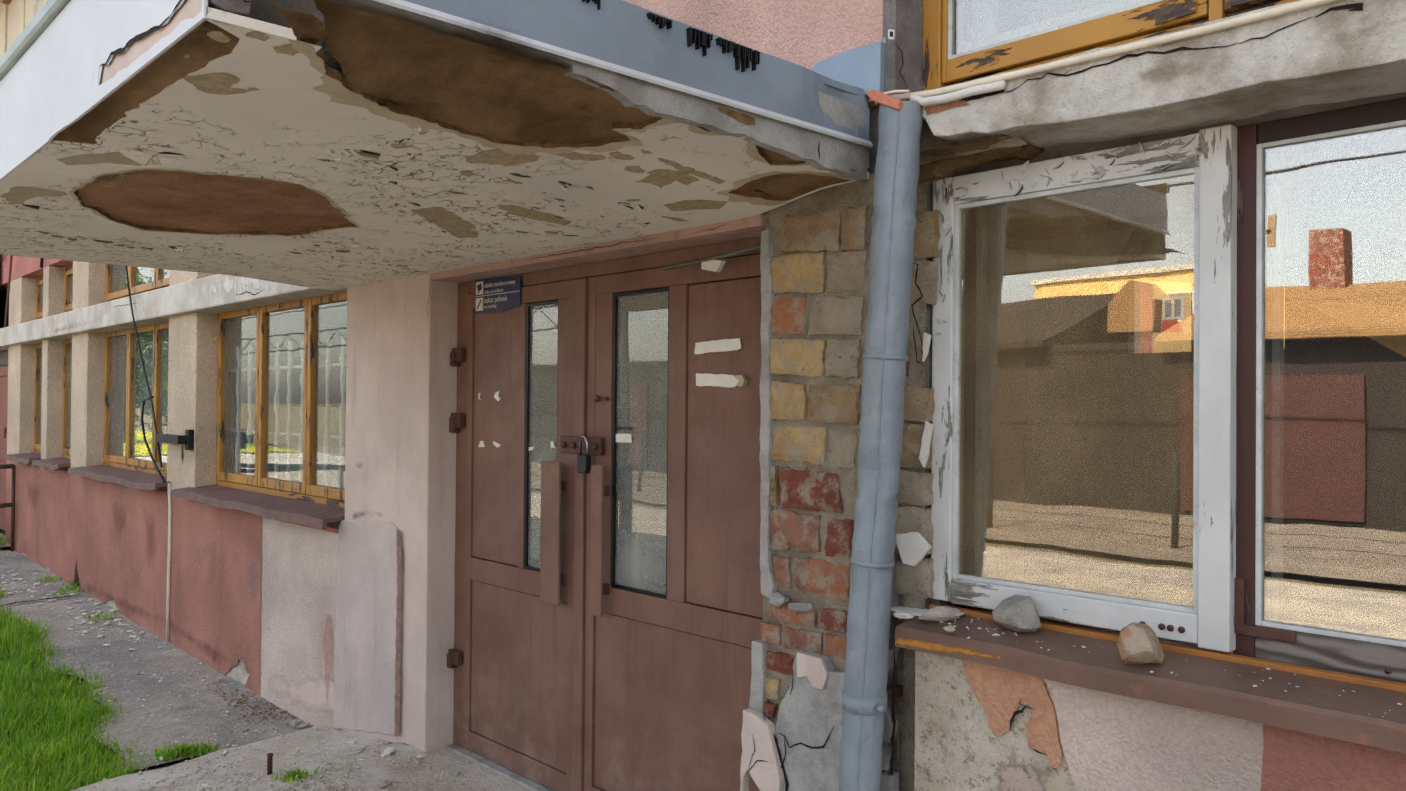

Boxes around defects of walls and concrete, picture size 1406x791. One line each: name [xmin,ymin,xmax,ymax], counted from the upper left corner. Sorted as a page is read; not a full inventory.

crack [92,0,181,87]
peeling [1000,133,1204,197]
flaking render [2,0,869,791]
crack [747,715,834,791]
flaking render [880,638,1077,791]